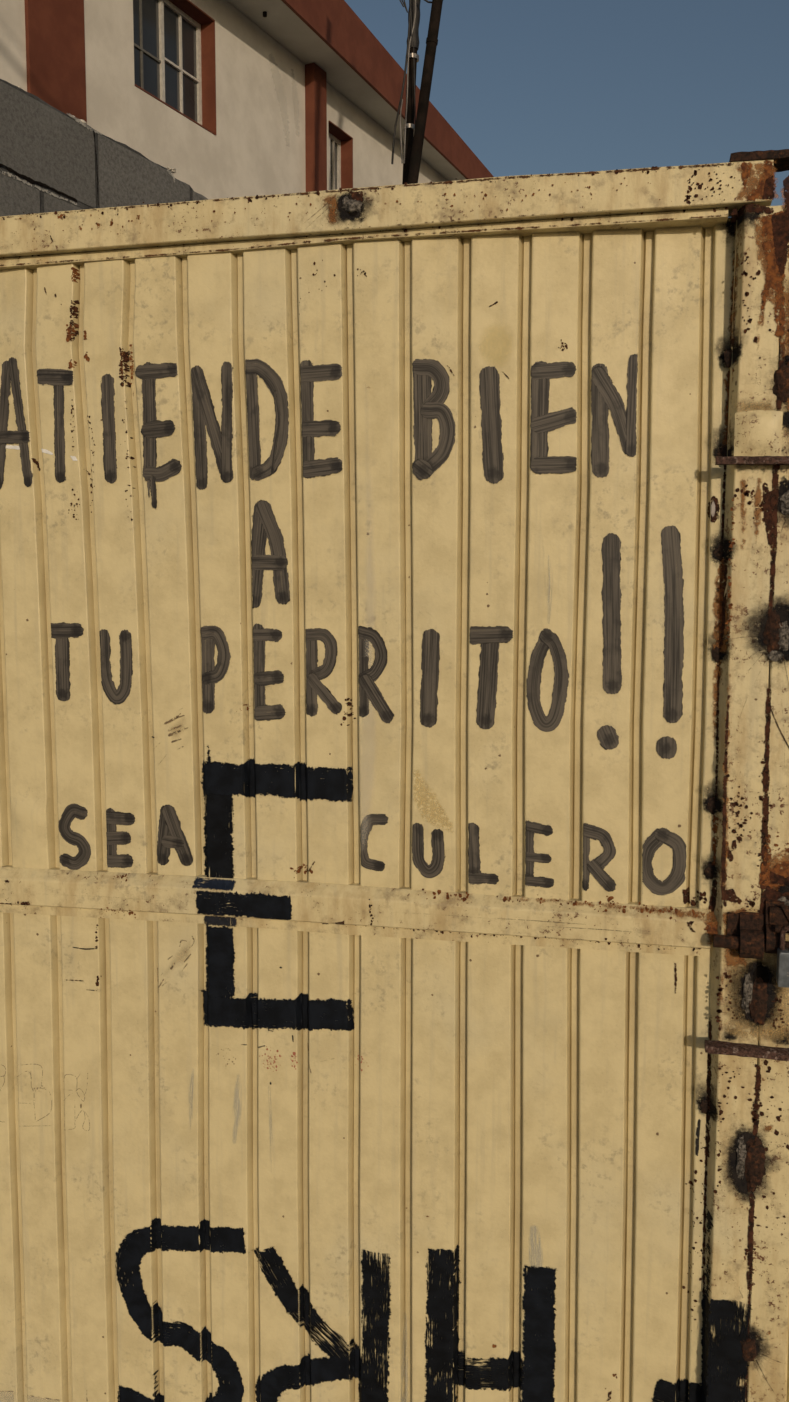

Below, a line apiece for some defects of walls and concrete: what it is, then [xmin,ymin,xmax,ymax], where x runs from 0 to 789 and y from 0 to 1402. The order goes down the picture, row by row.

rust [0,160,789,370]
rust [68,399,96,520]
rust [119,344,136,468]
rust [723,369,735,447]
rust [418,888,469,902]
rust [497,465,789,1336]